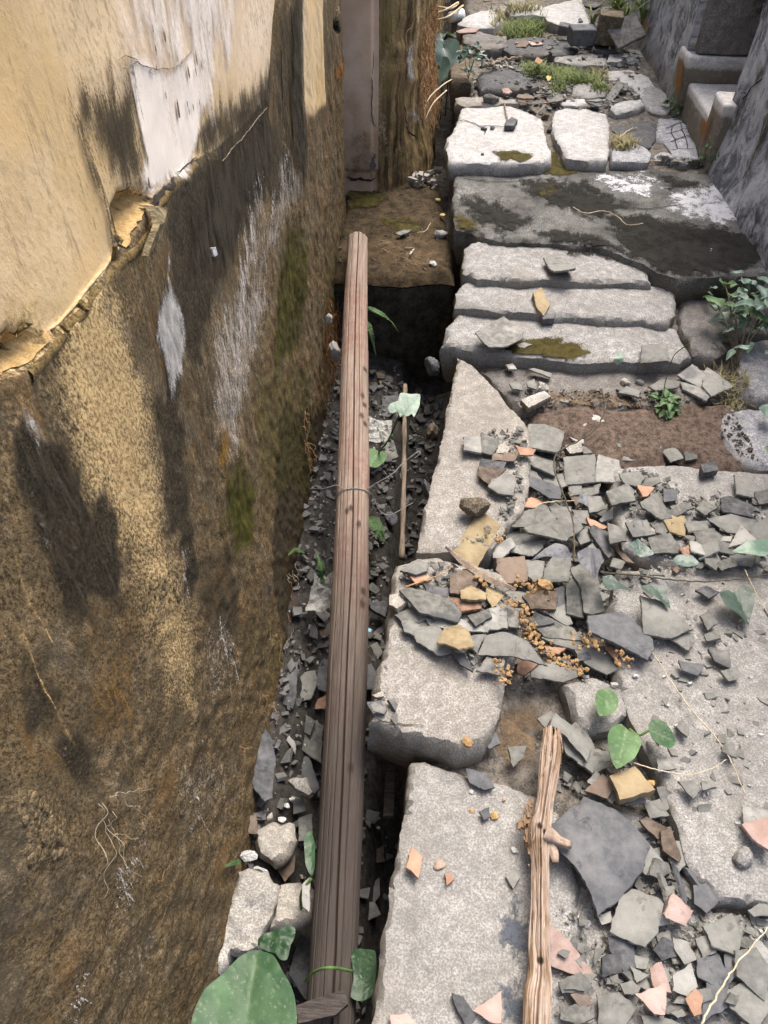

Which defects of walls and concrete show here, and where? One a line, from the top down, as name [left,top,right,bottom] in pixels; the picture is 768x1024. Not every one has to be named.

leakage [72,56,145,259]
peeling [0,0,233,383]
leakage [157,281,185,392]